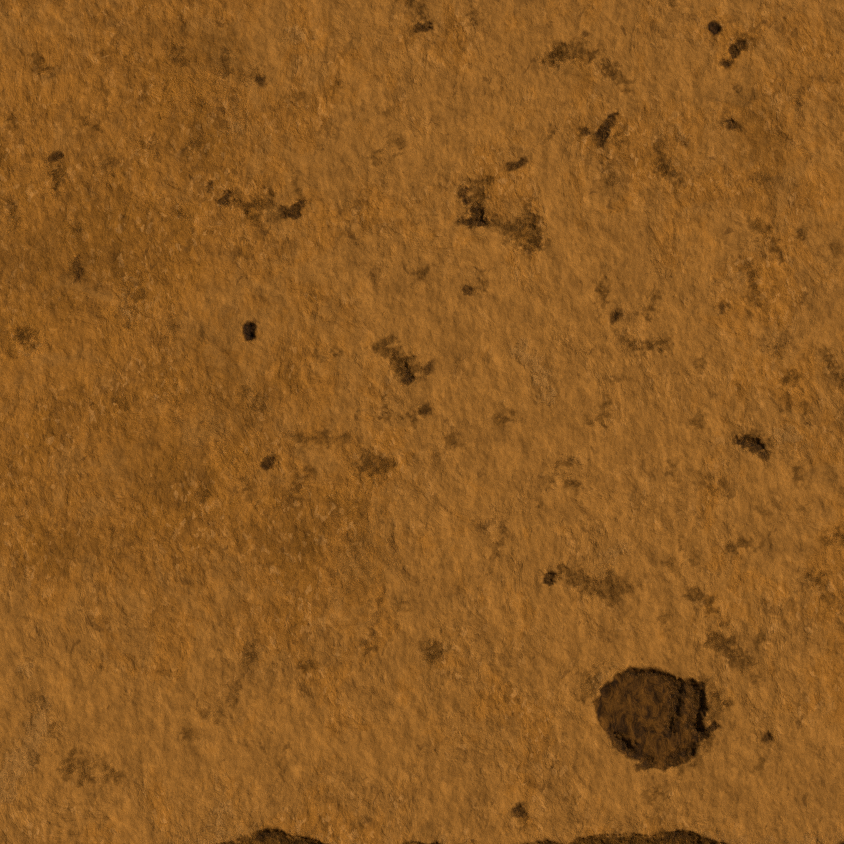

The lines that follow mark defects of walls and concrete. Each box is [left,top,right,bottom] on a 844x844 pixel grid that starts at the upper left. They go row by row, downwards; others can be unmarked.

peeling [694,722,719,738]
peeling [636,755,656,771]
crack [194,829,358,844]
crack [524,829,816,844]